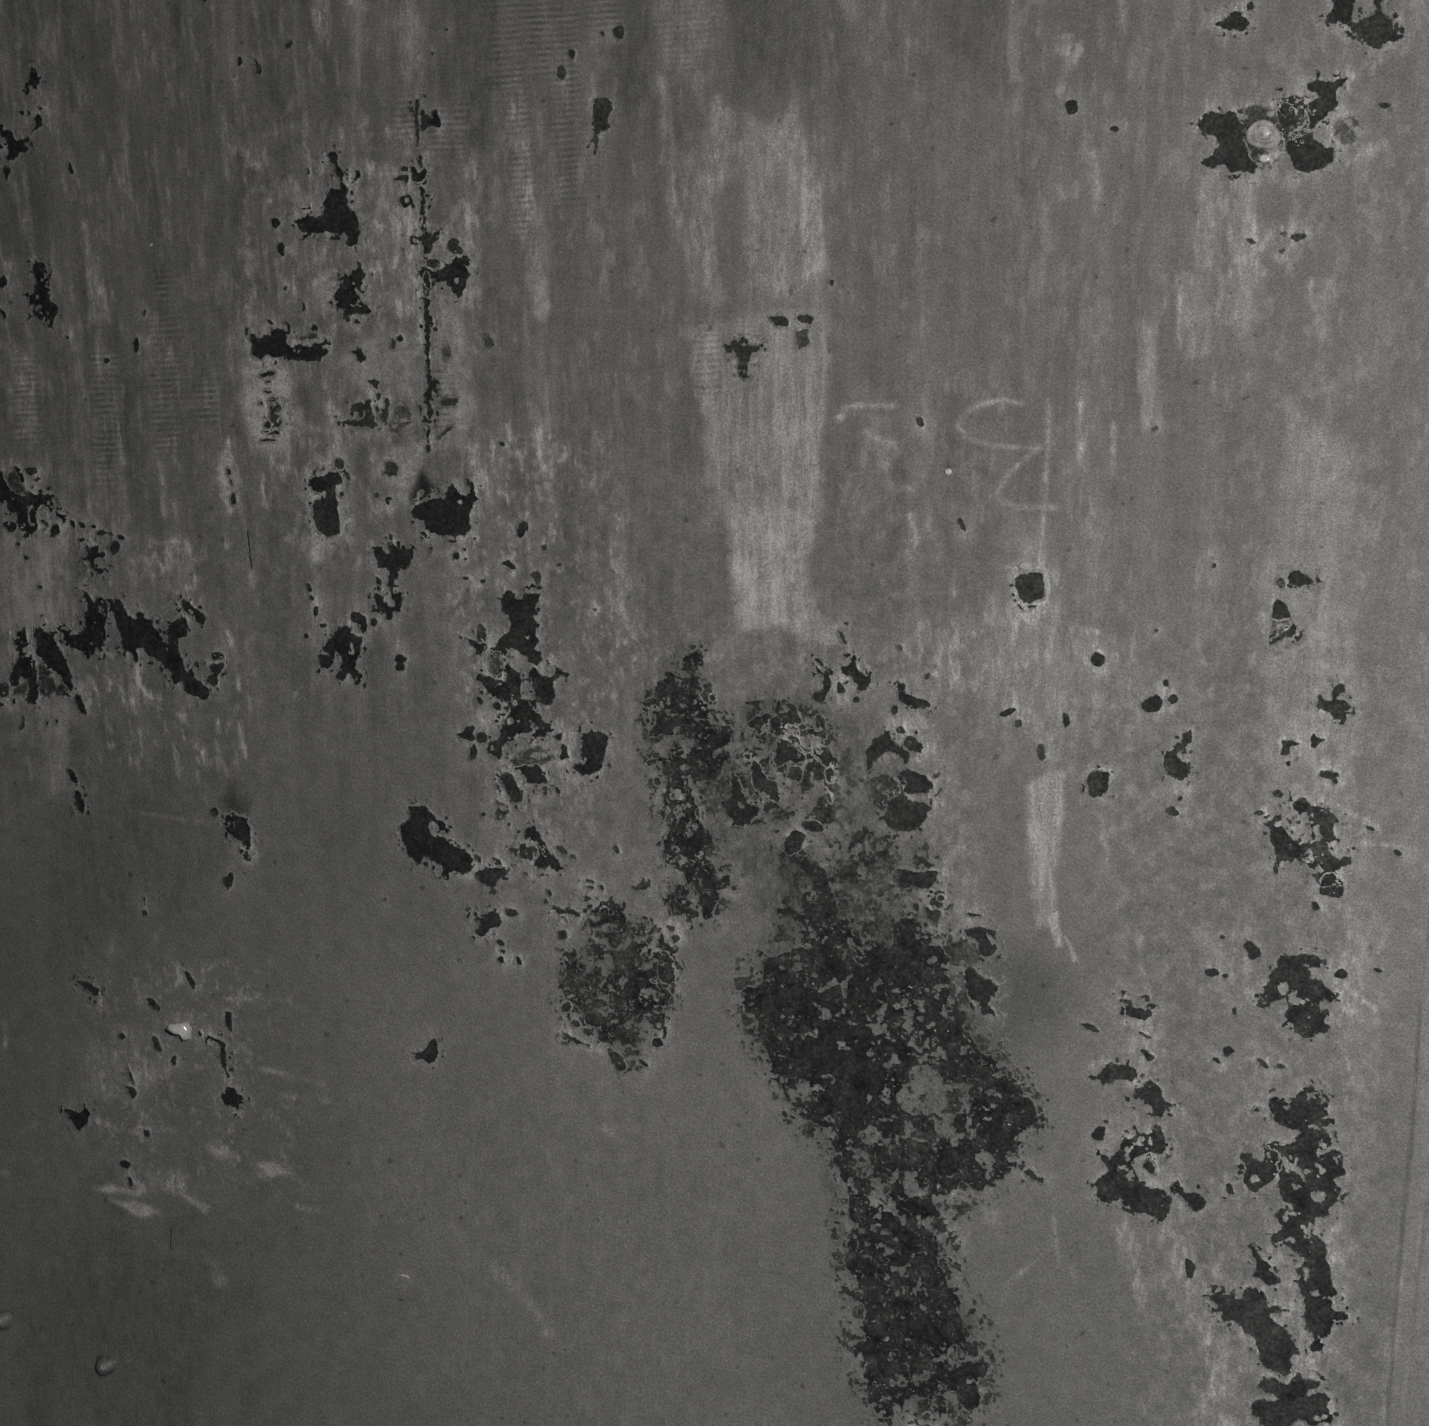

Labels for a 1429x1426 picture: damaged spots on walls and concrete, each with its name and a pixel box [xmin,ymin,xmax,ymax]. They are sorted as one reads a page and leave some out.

peeling [1186,0,1416,186]
peeling [242,142,411,445]
peeling [410,235,481,307]
peeling [0,460,233,734]
peeling [1266,561,1325,656]
peeling [1278,674,1364,770]
peeling [301,310,1060,1426]
peeling [1251,766,1377,915]
peeling [1390,845,1405,859]
peeling [1202,966,1231,981]
peeling [1217,932,1352,1050]
peeling [1077,989,1360,1426]